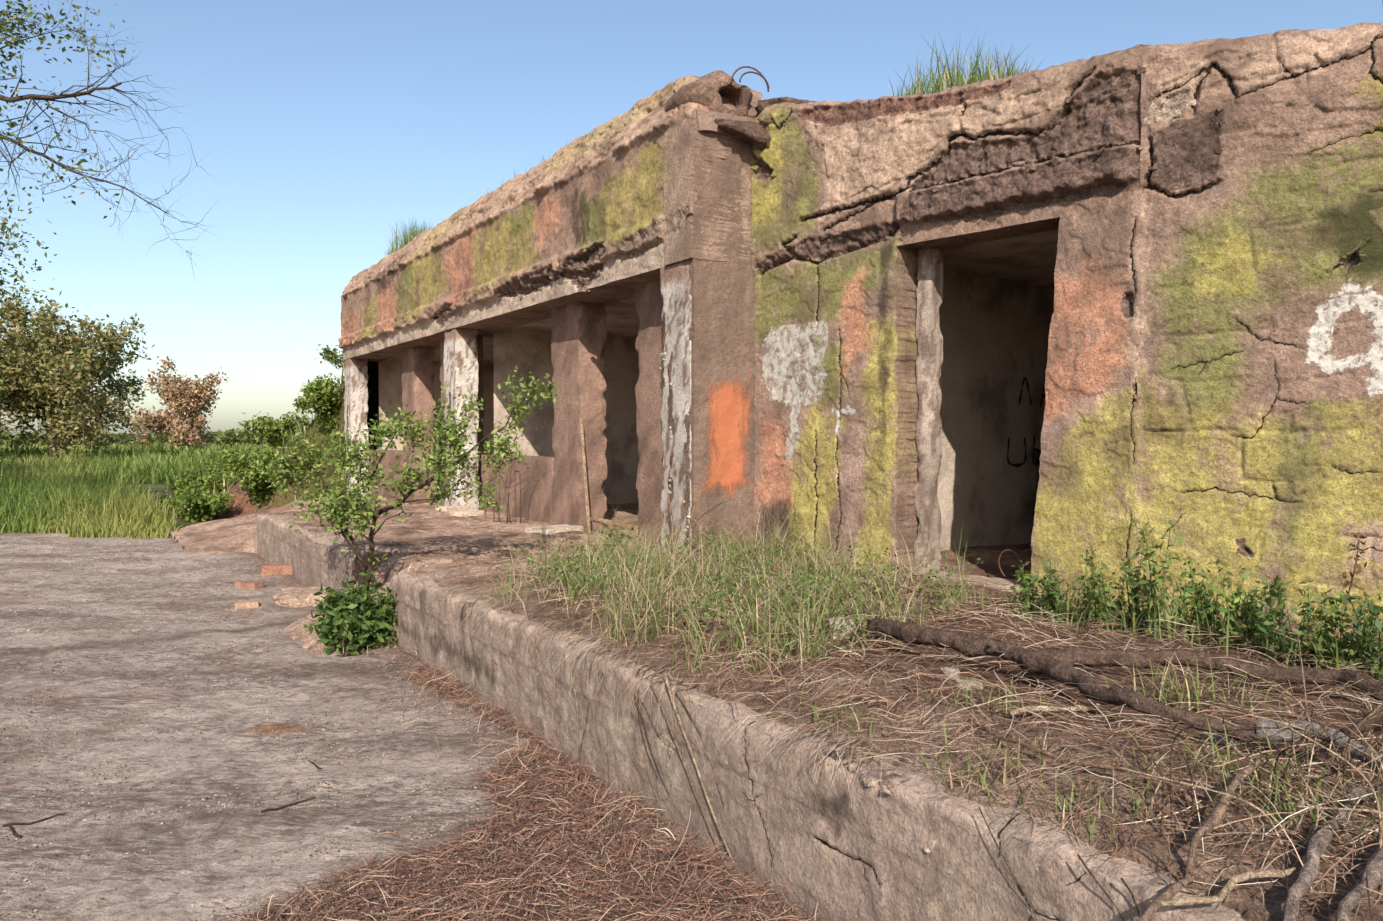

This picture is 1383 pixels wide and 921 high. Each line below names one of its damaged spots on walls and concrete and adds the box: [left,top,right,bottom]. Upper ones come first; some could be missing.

crack [1151,35,1383,114]
spalling [750,65,1225,270]
crack [1311,129,1382,152]
spalling [494,207,693,301]
crack [1331,244,1366,272]
leakage [1328,197,1383,275]
crack [762,68,1216,560]
crack [1171,318,1305,439]
corrosion [707,382,749,495]